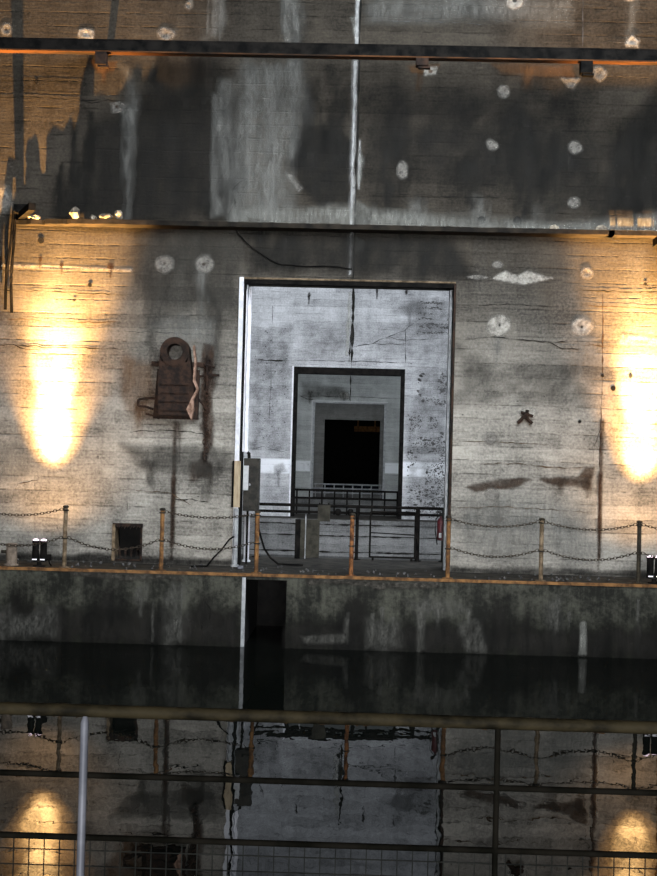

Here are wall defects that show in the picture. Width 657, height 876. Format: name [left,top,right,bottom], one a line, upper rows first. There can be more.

leakage [57,56,466,279]
leakage [368,86,657,230]
leakage [141,234,236,367]
leakage [128,447,226,487]
leakage [469,478,528,491]
leakage [541,467,594,488]
leakage [0,588,239,647]
leakage [286,601,657,659]